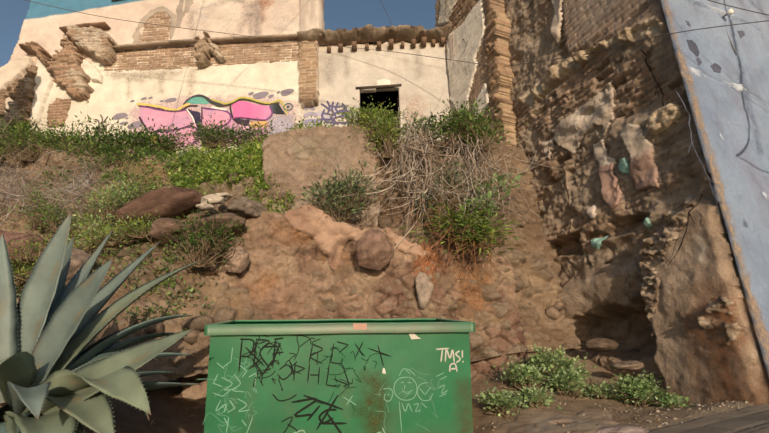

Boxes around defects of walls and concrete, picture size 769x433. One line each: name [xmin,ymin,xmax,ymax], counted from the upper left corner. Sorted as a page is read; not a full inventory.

spalling [0,0,198,128]
spalling [209,39,302,66]
peeling [440,0,489,119]
crack [641,50,720,266]